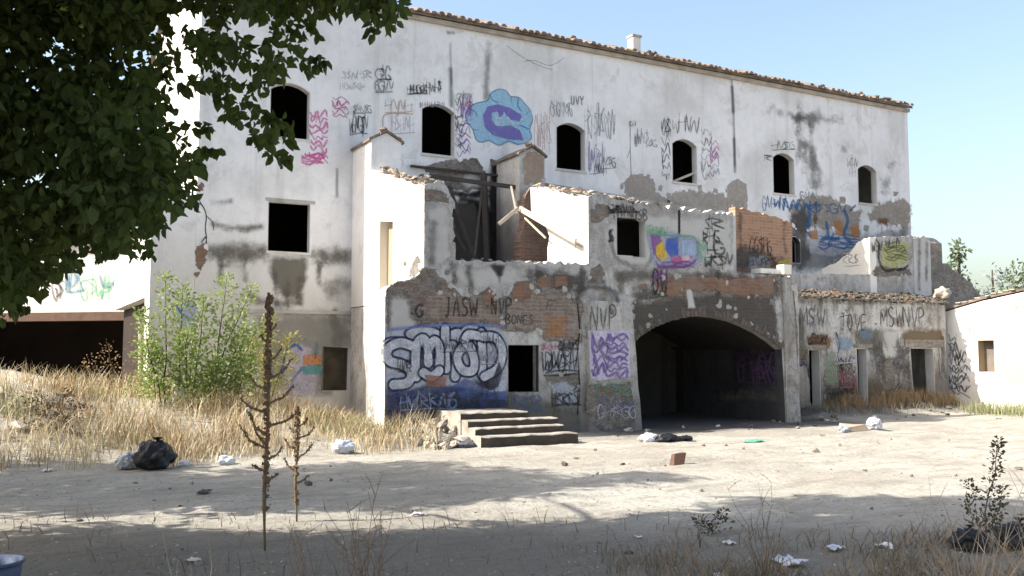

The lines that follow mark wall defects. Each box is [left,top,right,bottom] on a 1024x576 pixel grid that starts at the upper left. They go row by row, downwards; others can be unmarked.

water stain [793,115,818,171]
spalling [790,192,913,240]
spalling [194,243,208,277]
water stain [209,245,350,306]
flaking render [386,152,810,407]
spalling [545,371,636,431]